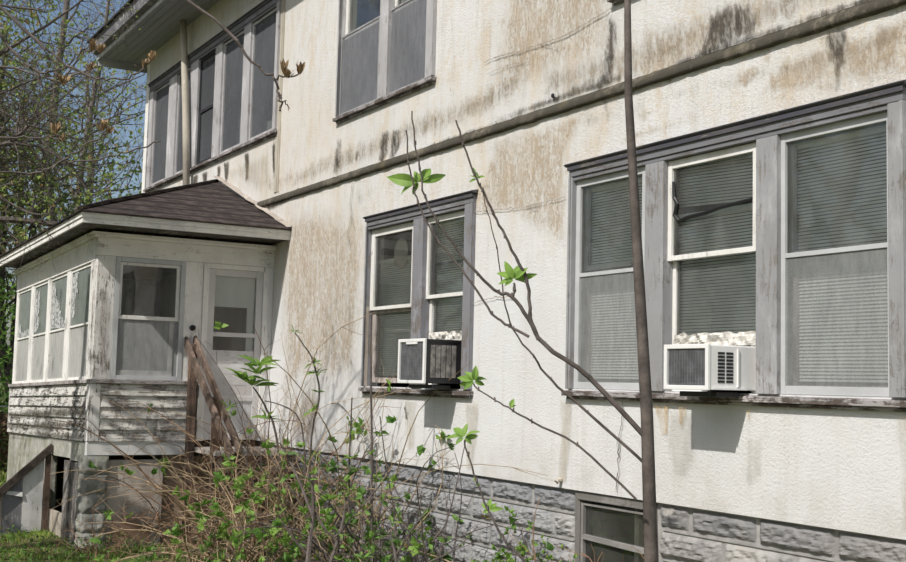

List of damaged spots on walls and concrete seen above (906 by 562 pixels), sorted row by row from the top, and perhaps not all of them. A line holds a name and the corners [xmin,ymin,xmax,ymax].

water stain [794,0,869,24]
water stain [678,5,760,64]
water stain [827,32,845,70]
water stain [334,131,405,171]
crack [615,403,623,488]